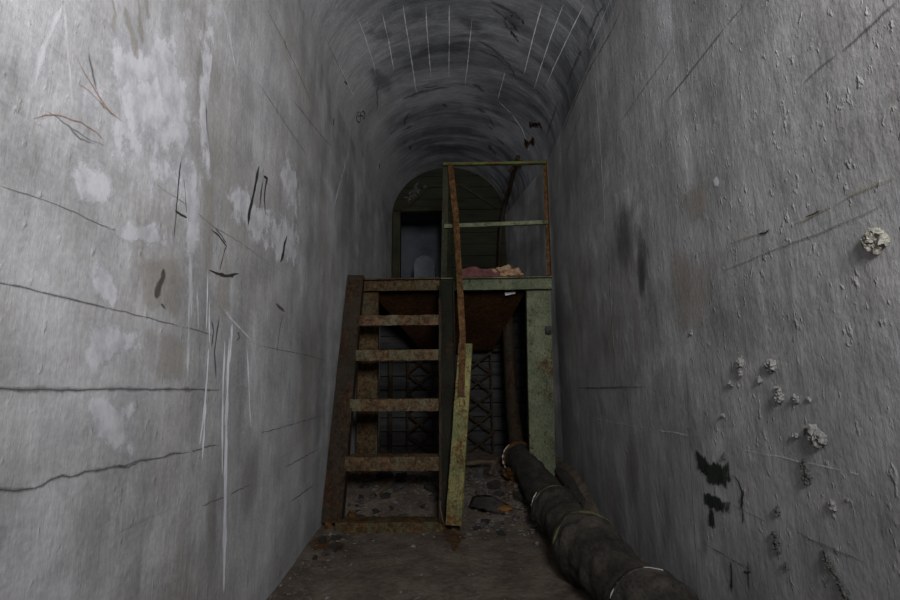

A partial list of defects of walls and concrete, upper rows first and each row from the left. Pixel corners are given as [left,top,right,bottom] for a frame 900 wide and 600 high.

crack [0,385,204,393]
crack [0,445,214,491]
water stain [187,249,210,460]
water stain [221,326,233,593]